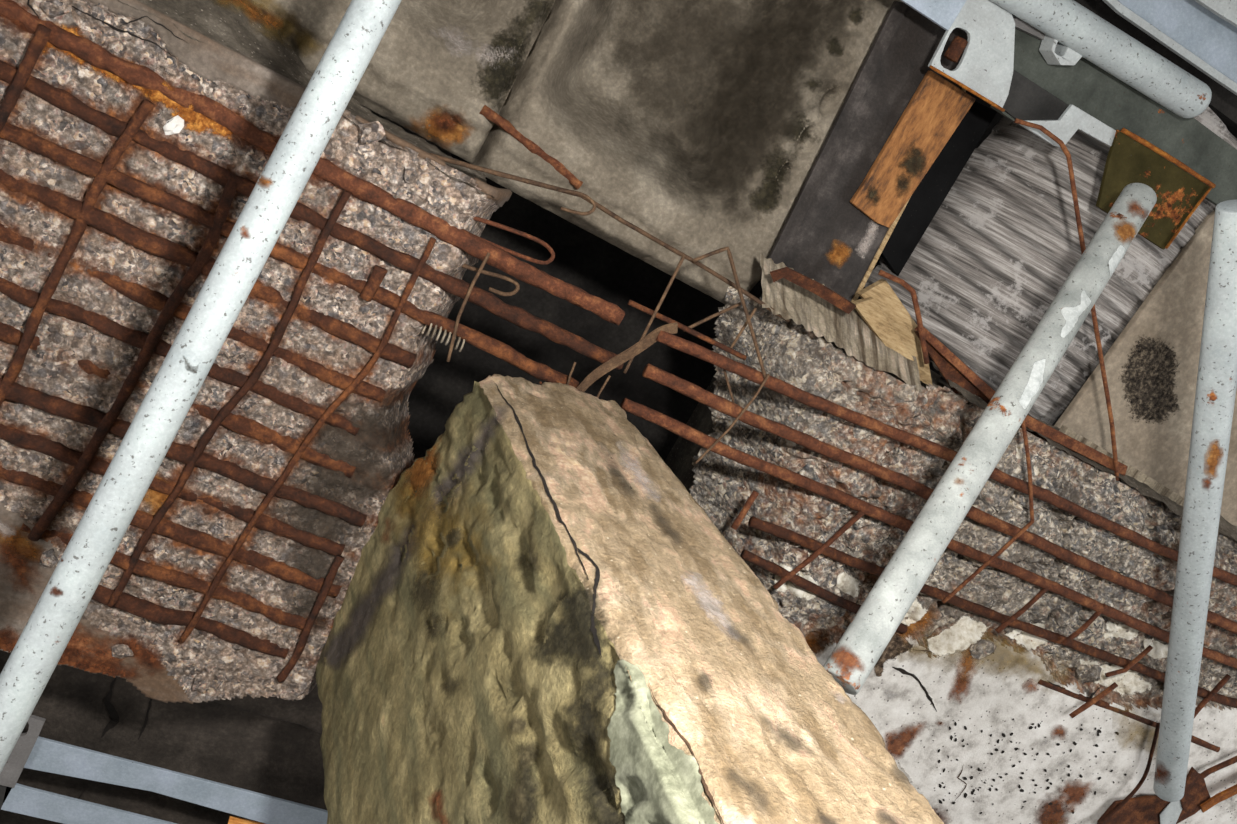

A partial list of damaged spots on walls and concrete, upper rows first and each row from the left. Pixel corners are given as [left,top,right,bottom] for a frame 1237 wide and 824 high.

corrosion [42,42,278,158]
damp [481,0,553,108]
damp [620,0,863,212]
spalling [0,0,295,568]
spalling [82,105,625,703]
crack [492,380,602,657]
spalling [620,286,984,654]
spalling [874,359,1182,728]
corrosion [1203,443,1223,488]
spalling [1194,533,1237,718]
corrosion [886,724,922,757]
corrosion [1036,784,1089,824]